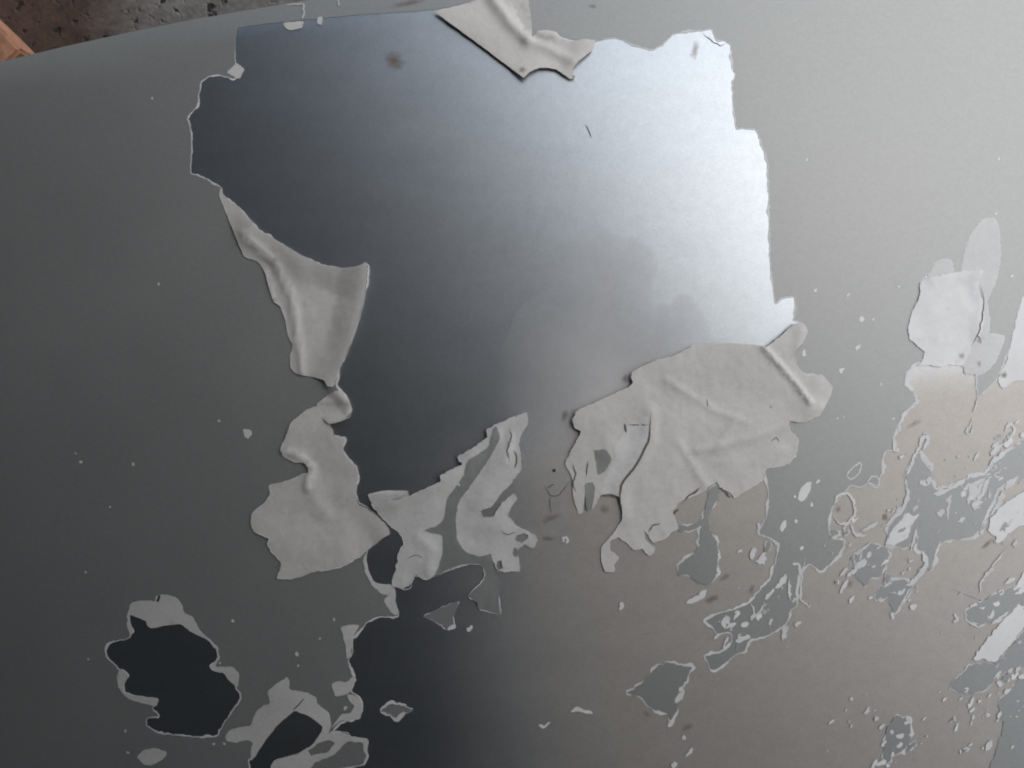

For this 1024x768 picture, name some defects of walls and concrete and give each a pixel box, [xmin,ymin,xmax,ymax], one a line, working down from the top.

peeling [105,595,241,745]
peeling [187,0,833,614]
peeling [225,218,1024,768]